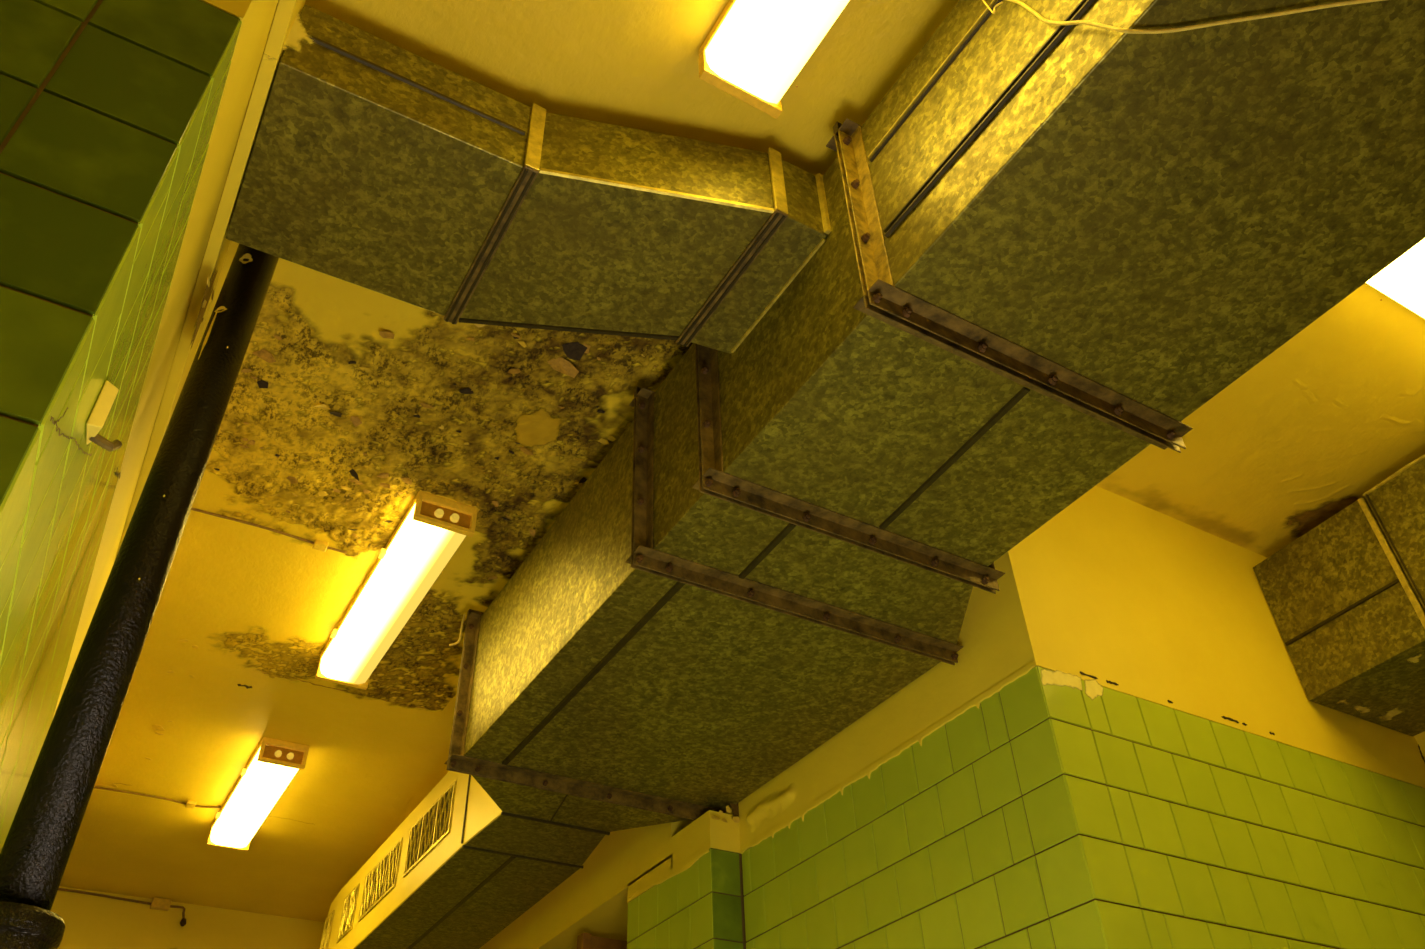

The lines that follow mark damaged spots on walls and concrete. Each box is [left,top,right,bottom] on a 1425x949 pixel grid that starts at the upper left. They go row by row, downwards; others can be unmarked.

flaking render [191,270,227,359]
crack [50,407,121,478]
peeling [206,285,693,607]
damp [1287,496,1361,538]
peeling [224,633,324,679]
peeling [337,590,466,710]